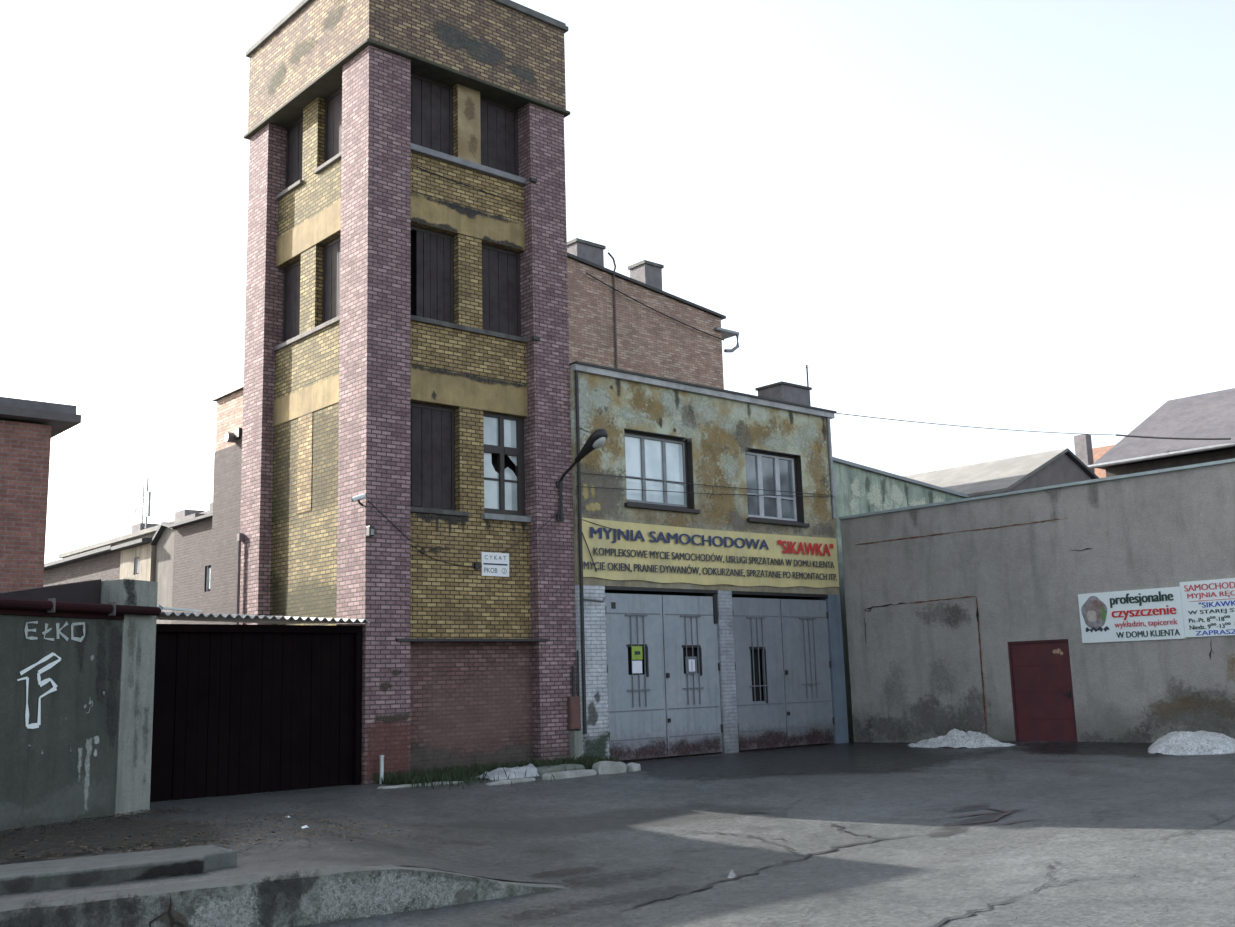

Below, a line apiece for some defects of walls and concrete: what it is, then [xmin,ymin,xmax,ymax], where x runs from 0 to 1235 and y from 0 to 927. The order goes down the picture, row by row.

peeling [571,377,830,525]
rust [610,736,720,759]
rust [738,729,834,750]
crack [621,802,911,910]
crack [932,860,1156,927]